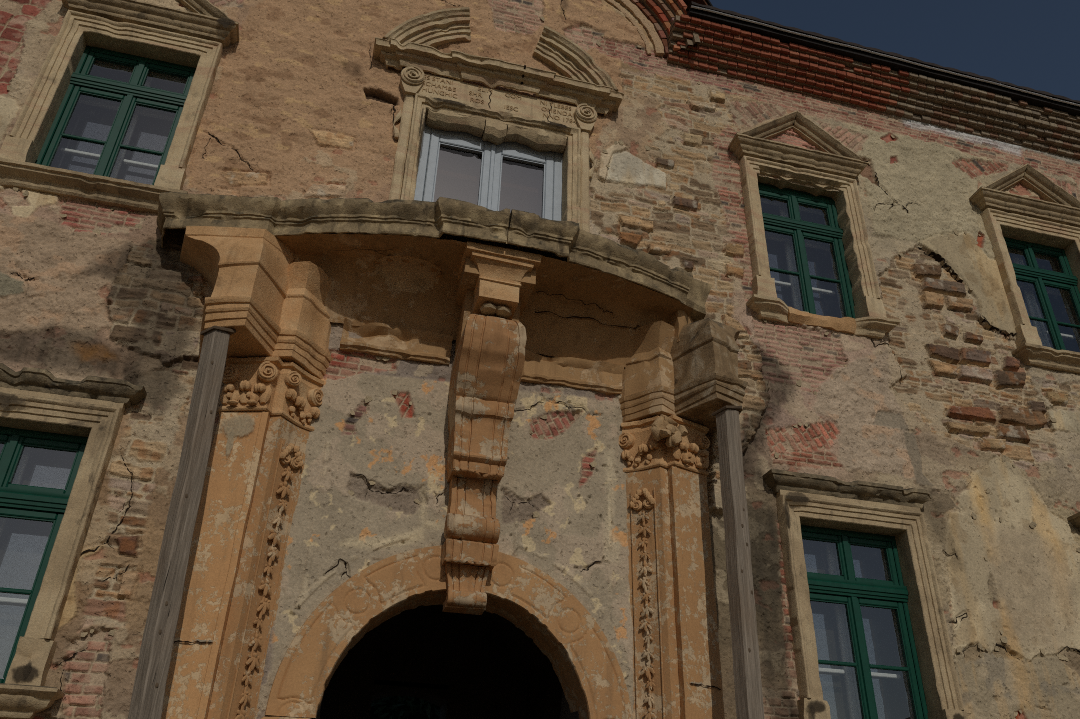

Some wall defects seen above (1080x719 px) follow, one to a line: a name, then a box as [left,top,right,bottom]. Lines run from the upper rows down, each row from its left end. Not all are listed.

flaking render [0,0,52,147]
crack [202,132,257,170]
flaking render [0,185,147,236]
crack [874,172,917,213]
flaking render [920,229,1016,336]
crack [535,291,640,330]
flaking render [752,313,849,395]
flaking render [347,472,420,515]
flaking render [501,487,552,524]
flaking render [947,490,1008,662]
crack [949,612,1020,660]
flaking render [63,628,117,719]